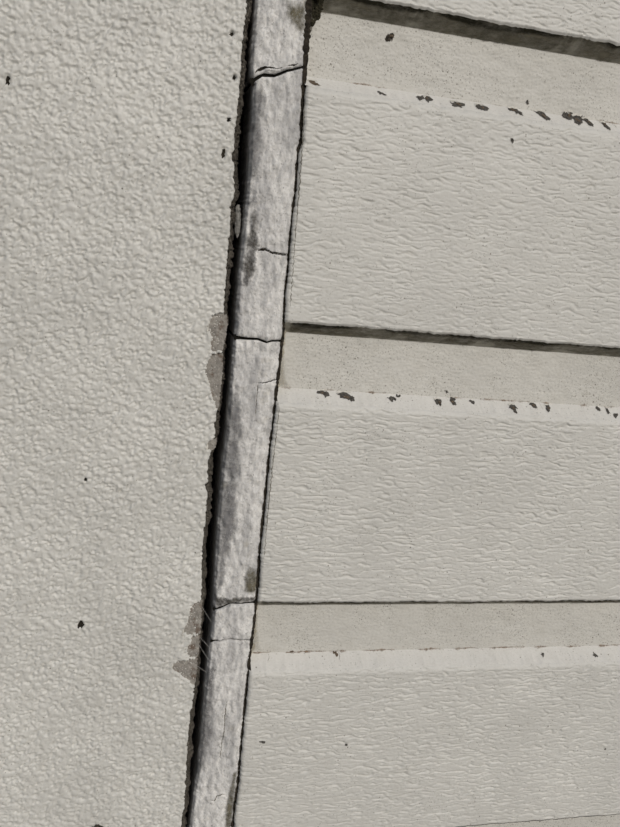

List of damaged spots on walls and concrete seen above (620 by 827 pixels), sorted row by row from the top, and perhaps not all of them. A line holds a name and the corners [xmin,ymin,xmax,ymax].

peeling [449,100,489,111]
peeling [508,100,550,120]
peeling [562,109,611,130]
peeling [317,389,355,402]
peeling [433,390,457,406]
spalling [173,0,252,827]
crack [210,0,312,827]